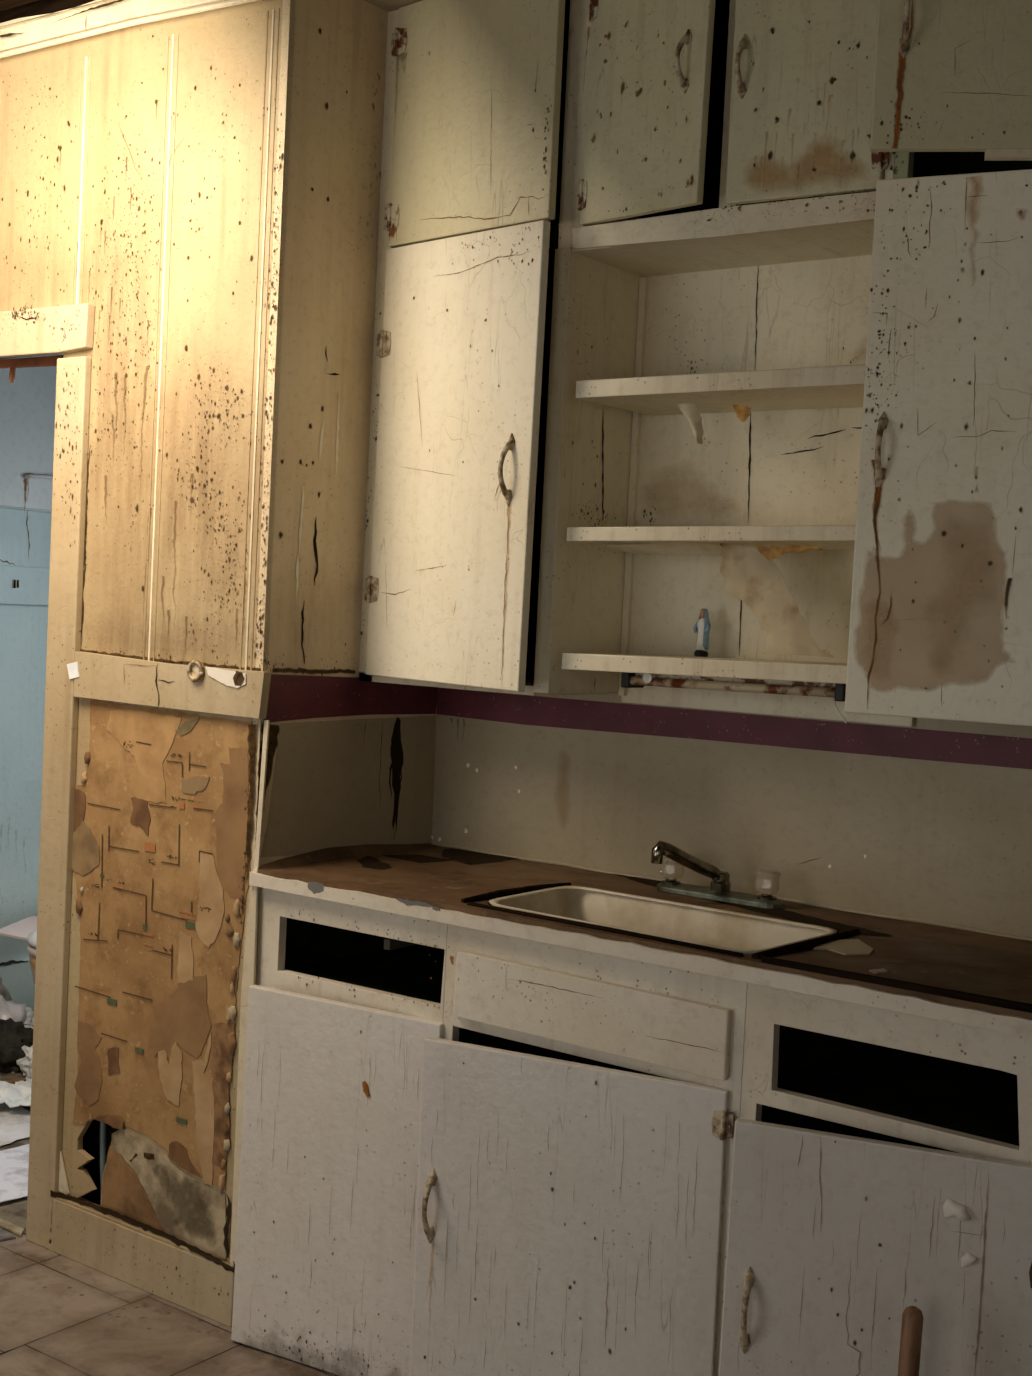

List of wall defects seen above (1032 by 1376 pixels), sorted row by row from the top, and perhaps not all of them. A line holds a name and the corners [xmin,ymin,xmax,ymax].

crack [389,717,403,838]
peeling [225,899,240,947]
flaking render [111,1102,230,1259]